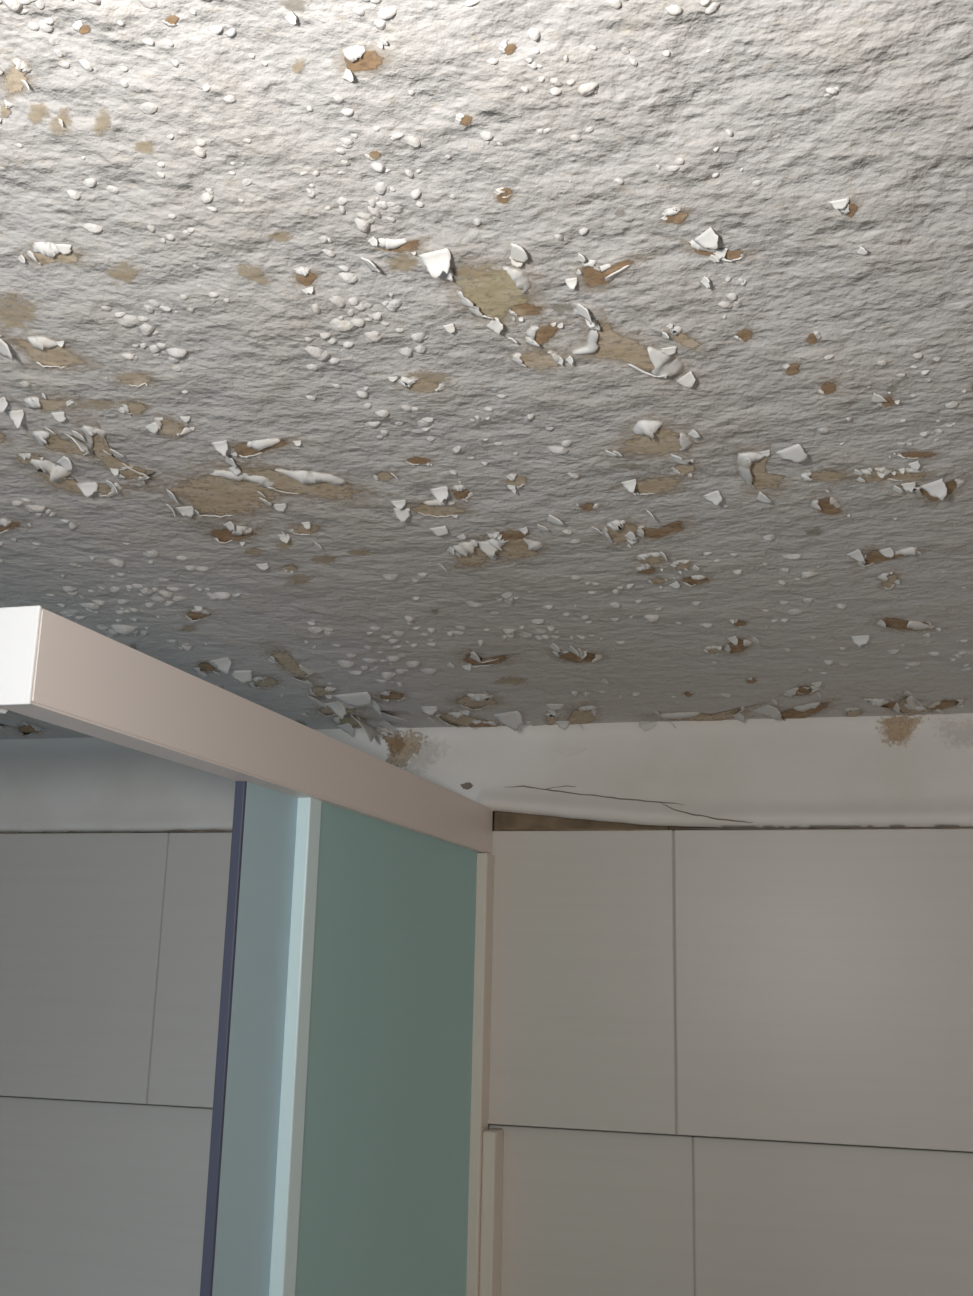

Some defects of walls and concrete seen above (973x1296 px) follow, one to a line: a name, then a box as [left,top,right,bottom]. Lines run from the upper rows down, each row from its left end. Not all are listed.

peeling [18,242,78,265]
peeling [687,227,747,290]
peeling [360,236,700,388]
peeling [0,373,195,497]
peeling [166,438,360,584]
peeling [390,481,564,571]
peeling [576,420,709,589]
peeling [737,443,966,517]
peeling [194,651,427,768]
peeling [420,677,597,731]
leakage [880,716,921,745]
crack [514,785,753,823]